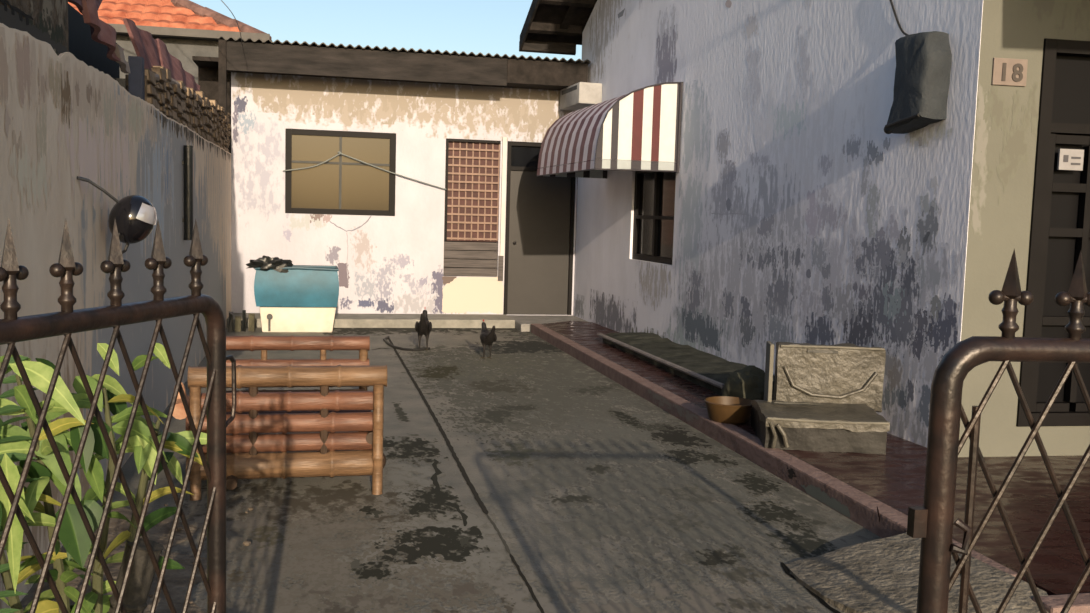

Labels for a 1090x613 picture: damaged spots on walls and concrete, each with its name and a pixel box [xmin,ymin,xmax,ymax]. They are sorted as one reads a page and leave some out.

flaking render [337,263,350,288]
damp [325,226,471,314]
damp [226,328,881,613]